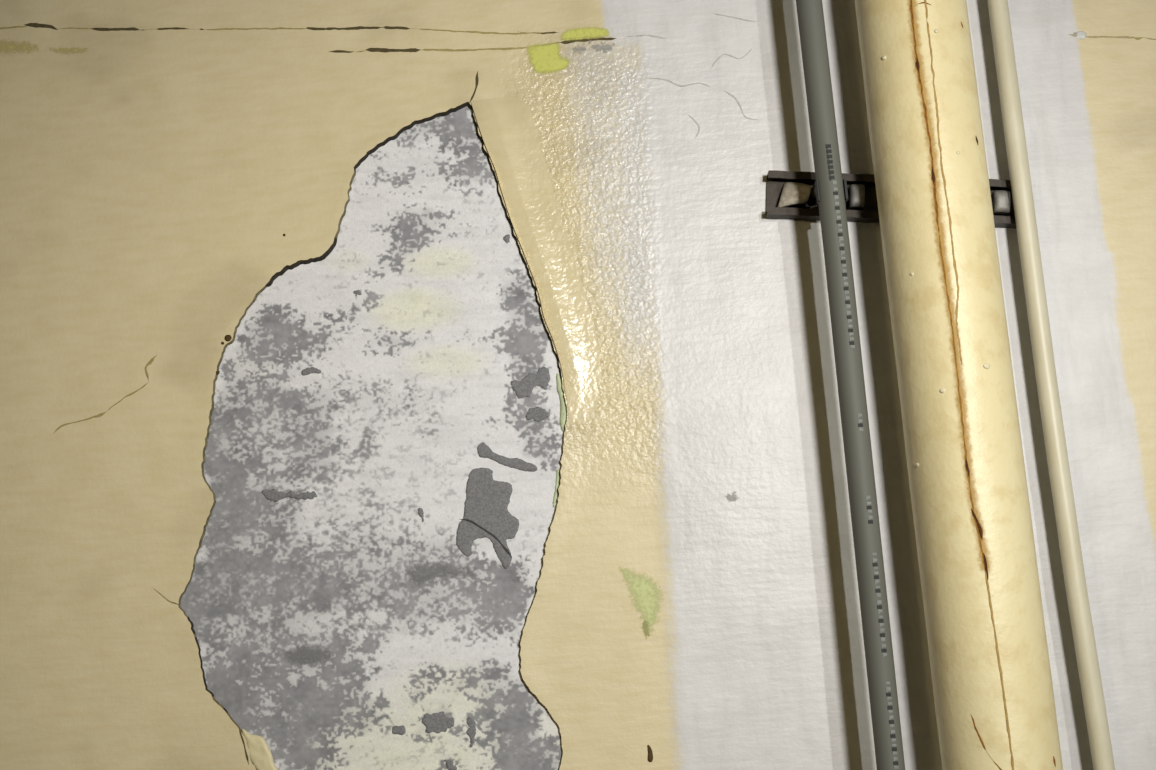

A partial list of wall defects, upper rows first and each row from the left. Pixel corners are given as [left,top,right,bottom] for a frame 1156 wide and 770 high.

crack [0,23,668,103]
crack [646,14,757,120]
crack [53,355,157,434]
peeling [179,102,567,770]